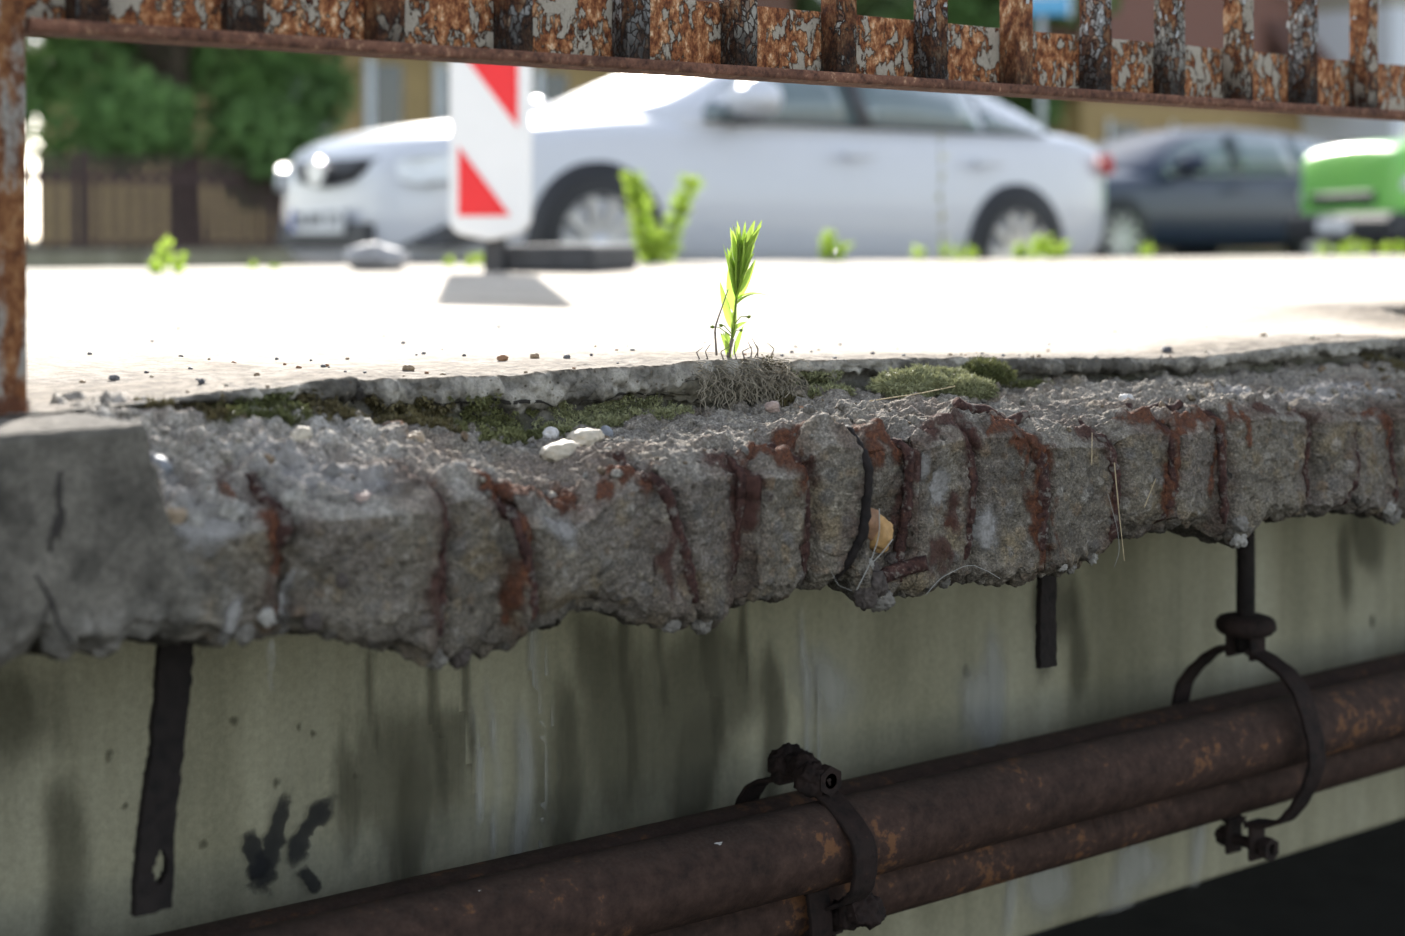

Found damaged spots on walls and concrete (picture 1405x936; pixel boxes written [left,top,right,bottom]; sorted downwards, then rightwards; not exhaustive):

corrosion [0,395,30,417]
corrosion [499,560,530,631]
corrosion [473,469,580,545]
corrosion [596,464,652,500]
corrosion [654,526,677,596]
spalling [55,360,1405,671]
corrosion [703,422,819,565]
corrosion [851,418,921,482]
corrosion [920,409,1060,573]
corrosion [1116,402,1315,514]
damp [347,665,495,879]
damp [50,804,81,936]